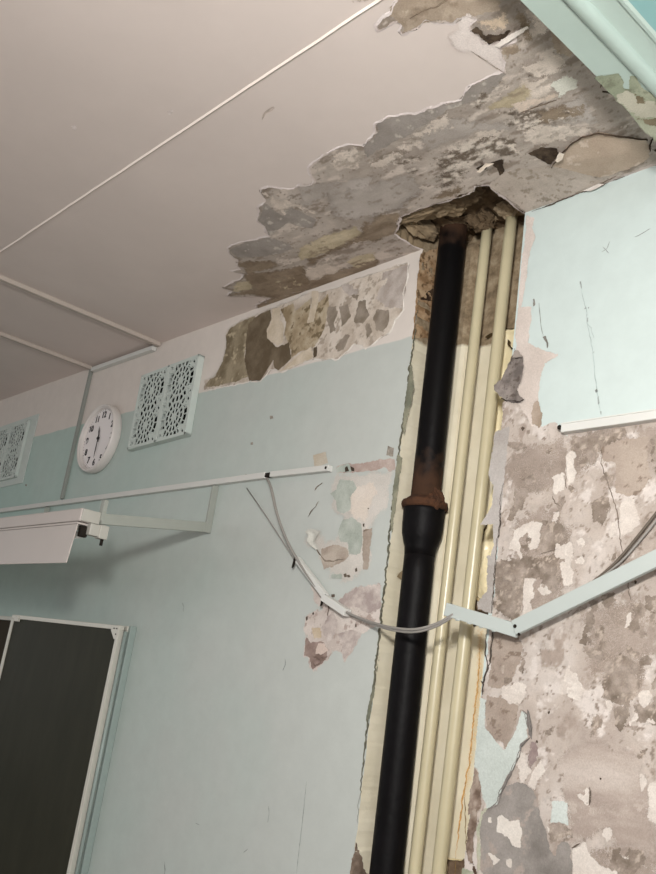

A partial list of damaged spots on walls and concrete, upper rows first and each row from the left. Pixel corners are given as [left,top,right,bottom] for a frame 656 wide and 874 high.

spalling [528,147,564,164]
crack [551,133,654,168]
peeling [595,73,656,152]
peeling [203,0,558,452]
crack [580,281,601,413]
corrosion [429,487,445,510]
peeling [303,446,395,672]
flaking render [350,843,367,874]